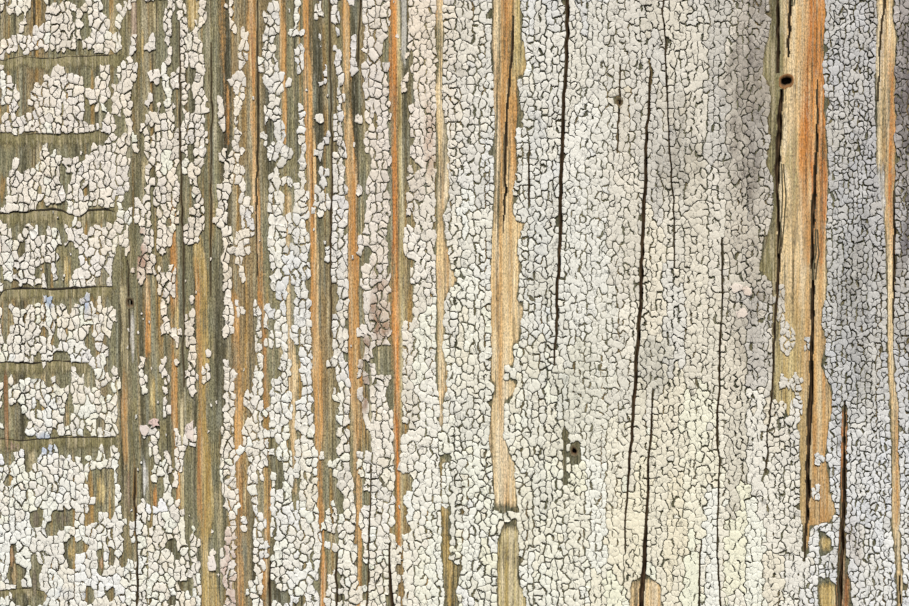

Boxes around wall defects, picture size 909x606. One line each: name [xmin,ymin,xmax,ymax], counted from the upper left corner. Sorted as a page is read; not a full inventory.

crack [0,434,114,442]
peeling [0,0,212,606]
crack [502,17,531,234]
peeling [207,0,909,606]
crack [552,0,571,366]
crack [615,65,623,153]
crack [623,0,676,606]
crack [764,0,795,473]
crack [803,79,820,561]
crack [835,401,847,606]